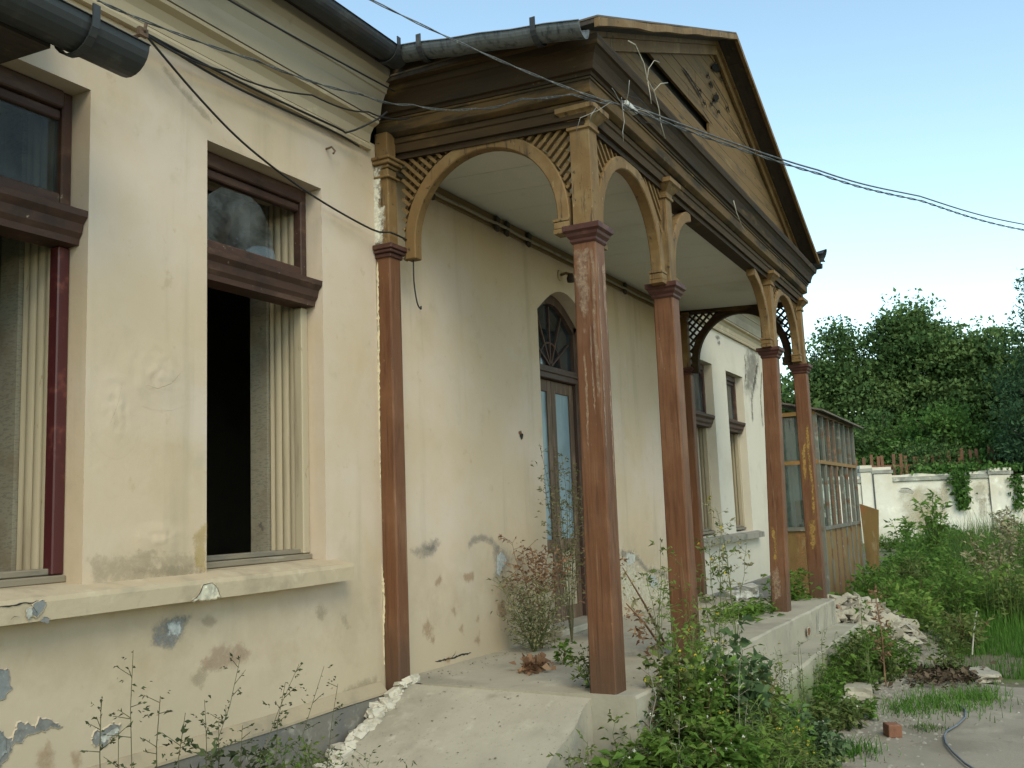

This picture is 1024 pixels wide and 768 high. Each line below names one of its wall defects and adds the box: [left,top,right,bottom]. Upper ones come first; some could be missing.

peeling [373,169,384,243]
peeling [154,618,186,647]
peeling [0,668,13,701]
peeling [0,716,63,768]
peeling [90,721,122,748]